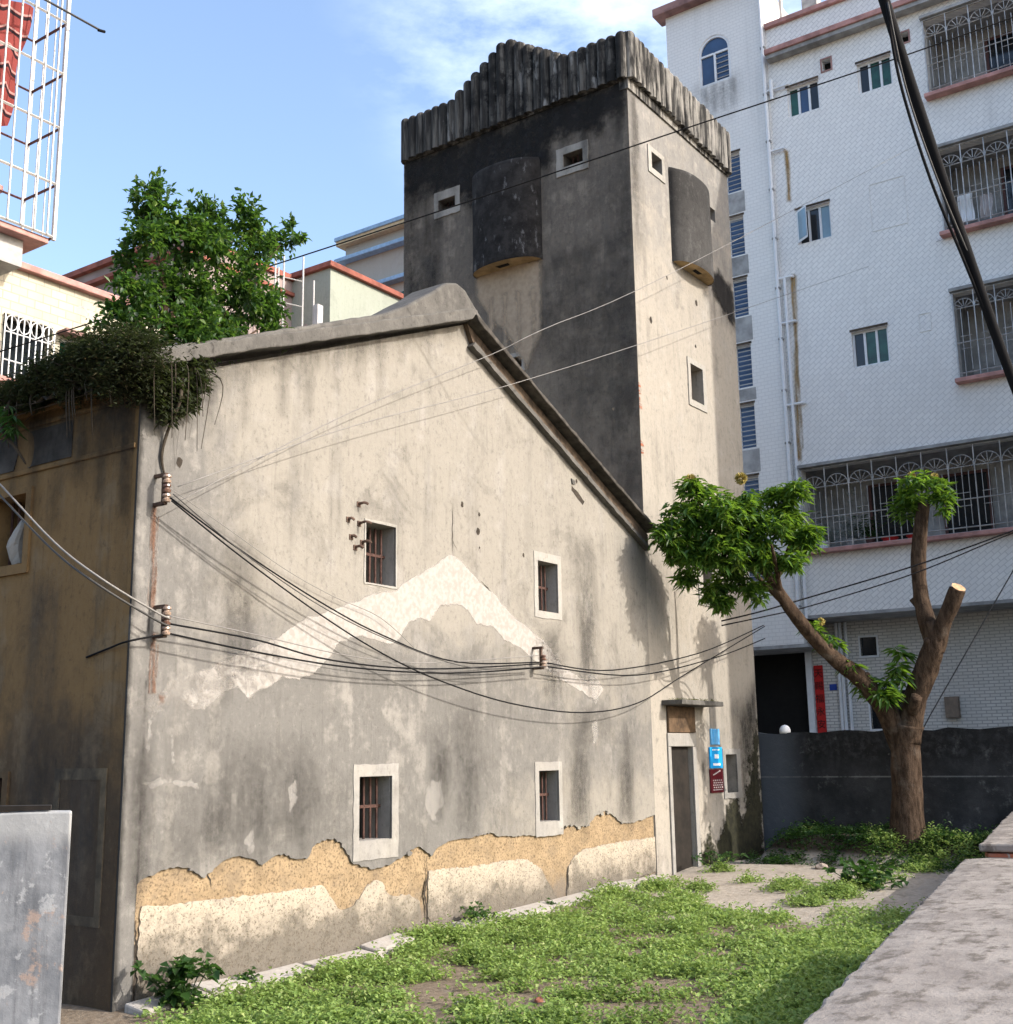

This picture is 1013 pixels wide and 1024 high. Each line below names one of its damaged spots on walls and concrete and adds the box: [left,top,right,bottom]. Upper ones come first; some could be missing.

damp [701,698,764,865]
peeling [134,811,654,948]